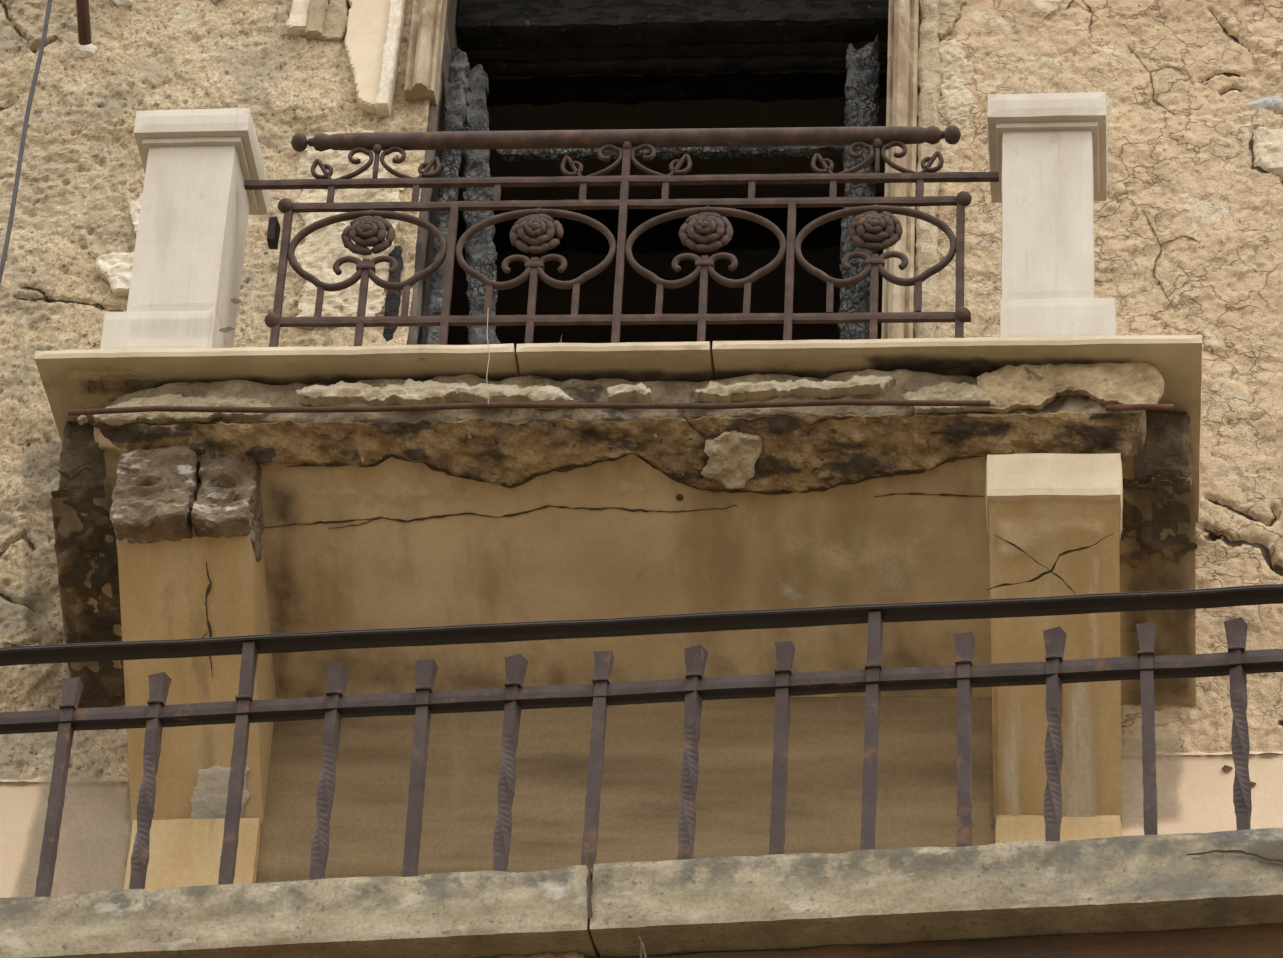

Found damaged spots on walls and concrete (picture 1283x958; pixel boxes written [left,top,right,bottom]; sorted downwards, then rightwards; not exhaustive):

crack [1128,11,1250,114]
crack [1249,133,1283,183]
crack [1143,210,1201,303]
spalling [77,394,271,425]
spalling [296,379,574,409]
spalling [607,382,652,403]
spalling [767,415,801,432]
spalling [694,362,1164,415]
spalling [246,445,276,463]
crack [265,416,989,529]
crack [1204,499,1277,571]
crack [987,533,1114,593]